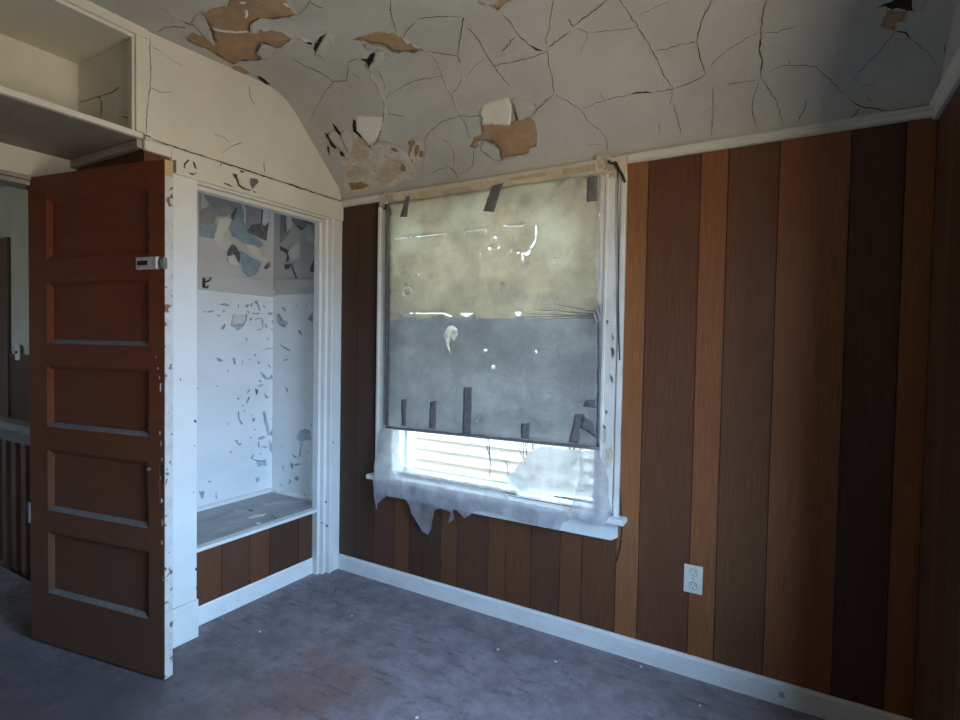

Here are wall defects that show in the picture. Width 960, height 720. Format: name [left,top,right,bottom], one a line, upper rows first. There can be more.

crack [80,4,342,202]
peeling [180,0,335,86]
peeling [349,29,425,69]
peeling [468,97,541,163]
crack [293,0,946,181]
peeling [877,0,927,34]
peeling [224,171,259,193]
peeling [199,193,314,279]
peeling [204,301,313,487]